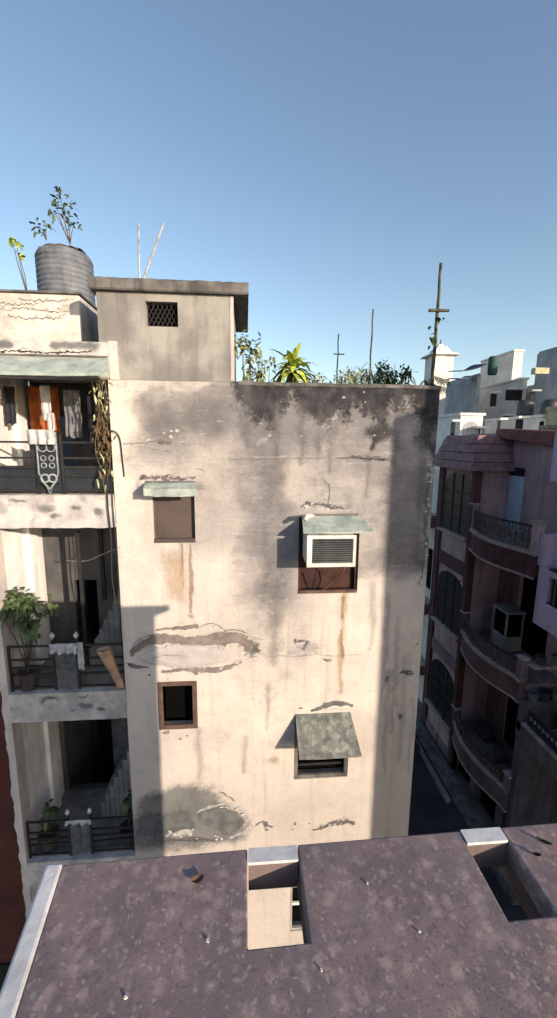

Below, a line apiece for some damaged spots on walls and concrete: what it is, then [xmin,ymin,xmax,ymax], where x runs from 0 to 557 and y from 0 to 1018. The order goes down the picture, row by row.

crack [0,296,70,320]
crack [0,347,92,355]
water stain [232,381,440,463]
peeling [127,623,261,676]